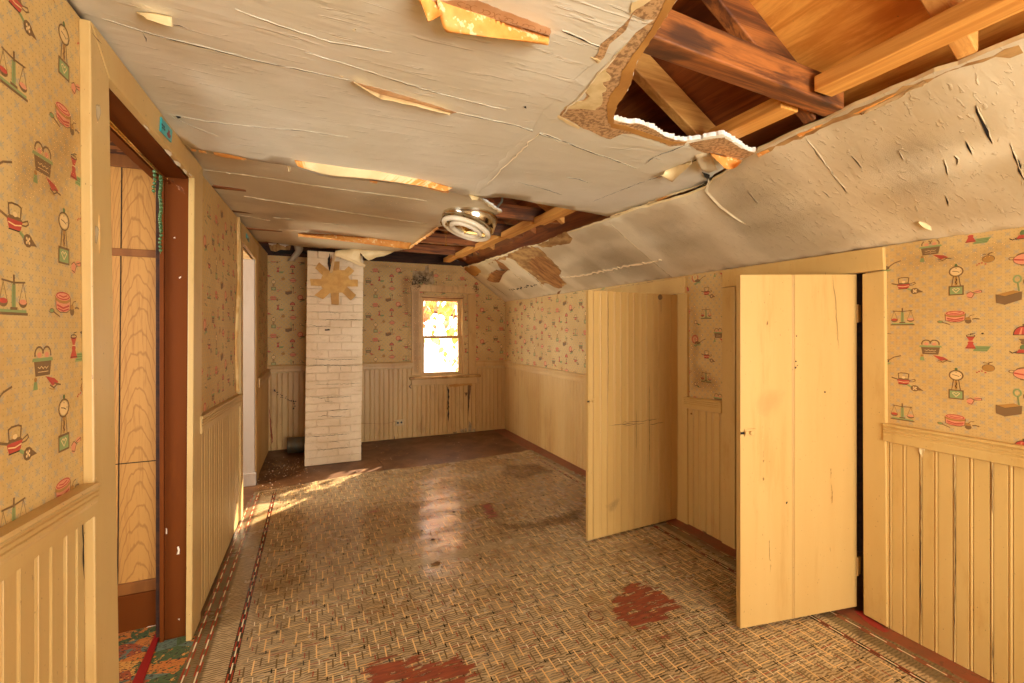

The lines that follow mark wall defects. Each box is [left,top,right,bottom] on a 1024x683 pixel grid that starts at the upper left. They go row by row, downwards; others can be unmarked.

crack [92,9,687,202]
crack [204,169,427,234]
peeling [268,233,411,262]
peeling [464,232,573,294]